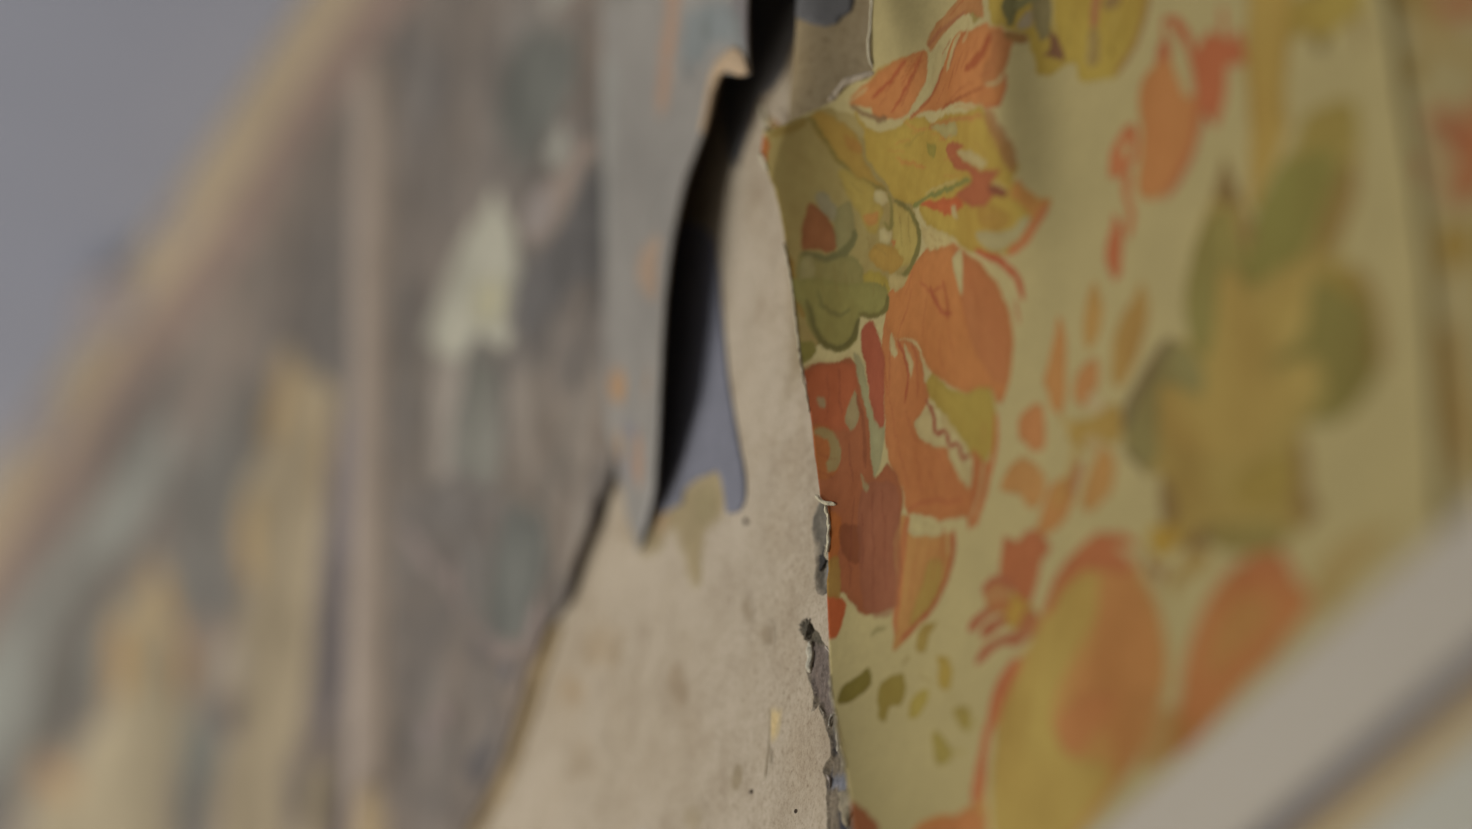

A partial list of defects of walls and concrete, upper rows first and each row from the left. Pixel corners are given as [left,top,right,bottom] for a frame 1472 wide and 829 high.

peeling [601,0,752,552]
peeling [428,351,464,489]
spalling [811,502,828,596]
spalling [798,618,853,829]